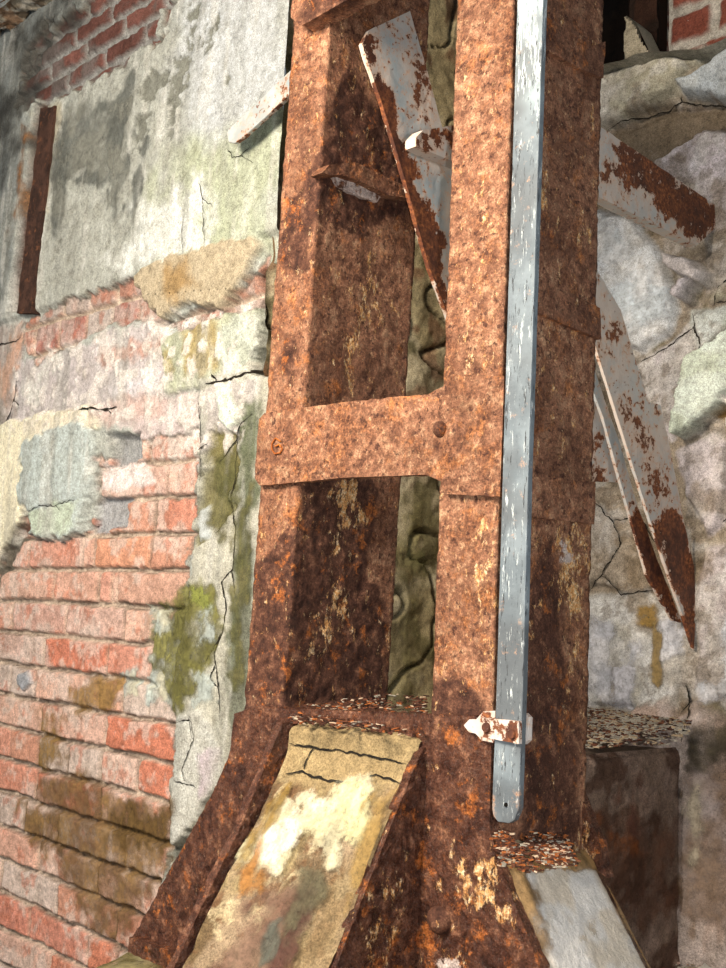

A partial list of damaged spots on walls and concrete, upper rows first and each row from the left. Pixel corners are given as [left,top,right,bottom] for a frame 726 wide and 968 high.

damp [49,69,149,234]
spalling [25,0,175,107]
crack [608,98,726,130]
spalling [24,236,270,366]
crack [198,370,264,711]
damp [147,604,172,635]
spalling [0,430,201,968]
damp [69,668,169,714]
crack [286,743,402,783]
damp [16,716,172,940]
corrosion [209,840,311,968]
corrosion [351,795,387,886]